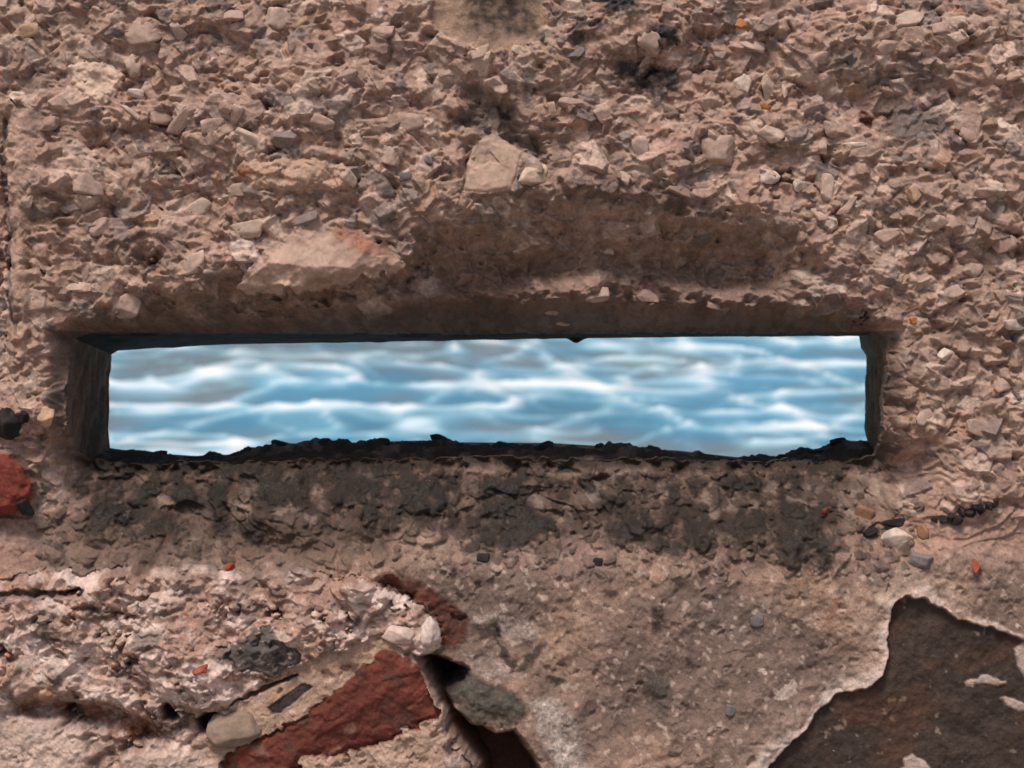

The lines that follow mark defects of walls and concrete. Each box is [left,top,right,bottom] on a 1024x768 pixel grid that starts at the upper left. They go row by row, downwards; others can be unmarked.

crack [409,651,542,768]
peeling [750,586,1024,768]